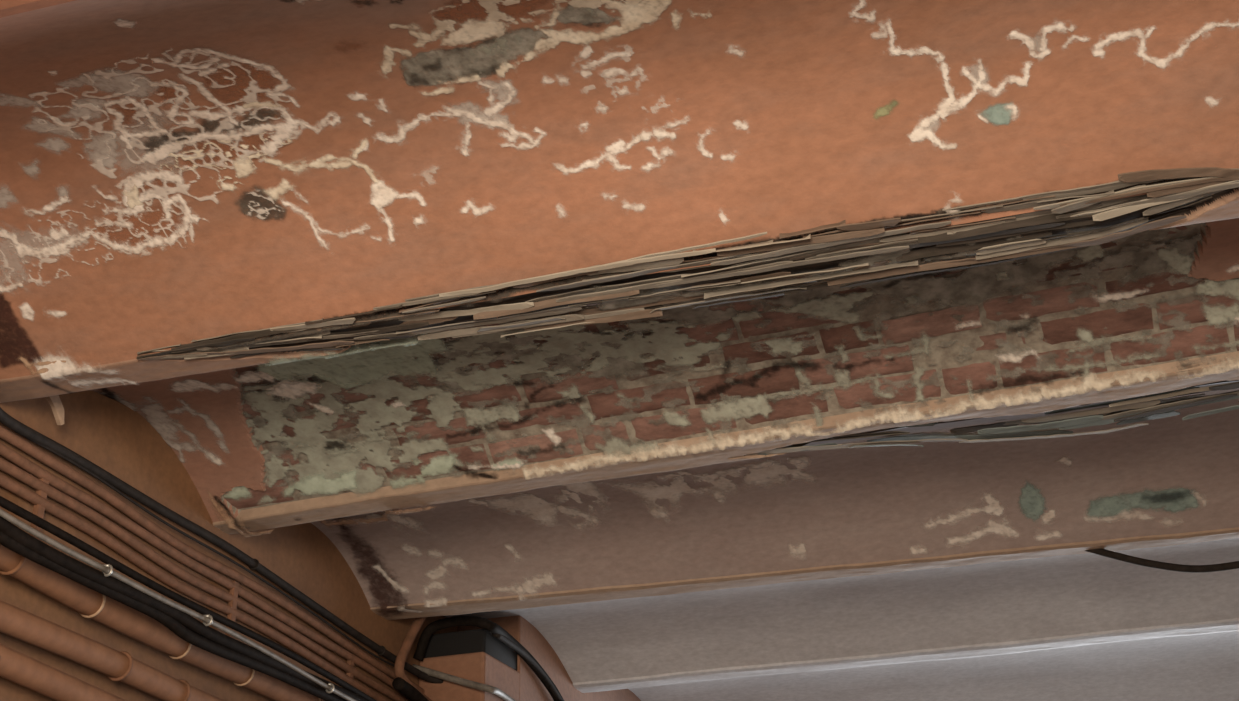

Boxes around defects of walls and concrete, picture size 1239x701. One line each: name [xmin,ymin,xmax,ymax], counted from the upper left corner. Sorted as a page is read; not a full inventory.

peeling [0,48,340,375]
spalling [381,0,711,95]
flaking render [136,167,1239,537]
crack [850,0,1239,149]